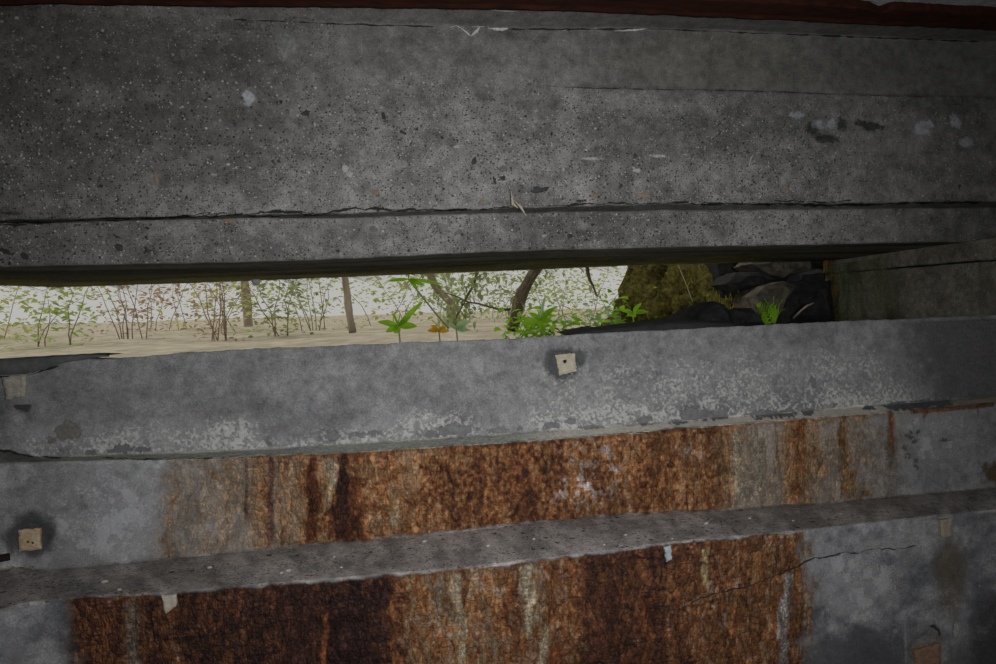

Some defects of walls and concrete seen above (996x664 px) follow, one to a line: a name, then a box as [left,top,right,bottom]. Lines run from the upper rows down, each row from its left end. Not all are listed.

crack [0,206,509,226]
crack [547,199,980,207]
peeling [85,443,151,455]
rust [160,411,895,557]
rust [66,533,816,664]
crack [649,541,918,608]